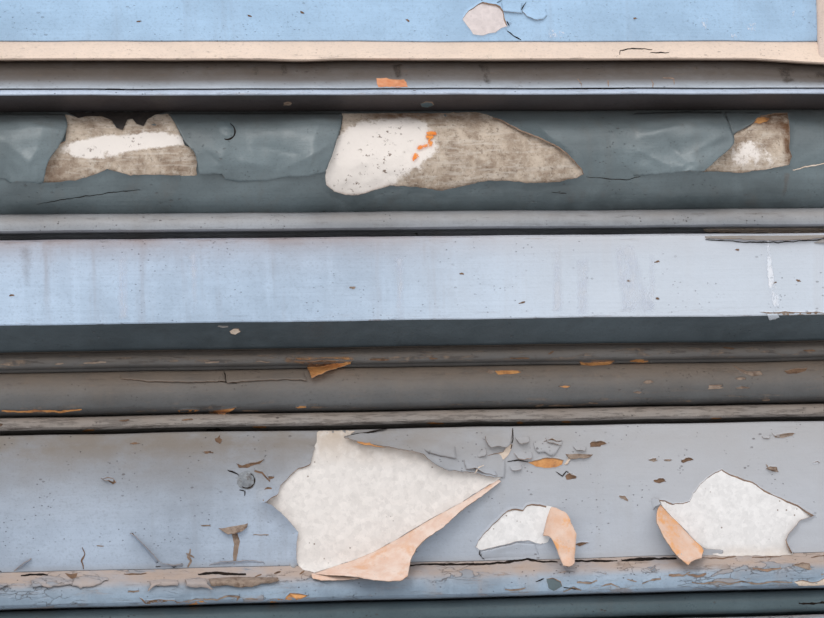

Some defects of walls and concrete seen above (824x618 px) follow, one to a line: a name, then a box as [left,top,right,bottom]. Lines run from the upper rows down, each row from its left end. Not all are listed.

peeling [461,0,547,40]
peeling [0,99,589,205]
peeling [610,110,797,178]
peeling [703,228,824,251]
peeling [765,464,780,473]
peeling [249,428,608,582]
peeling [651,468,824,587]
peeling [267,591,310,604]
peeling [536,576,576,593]